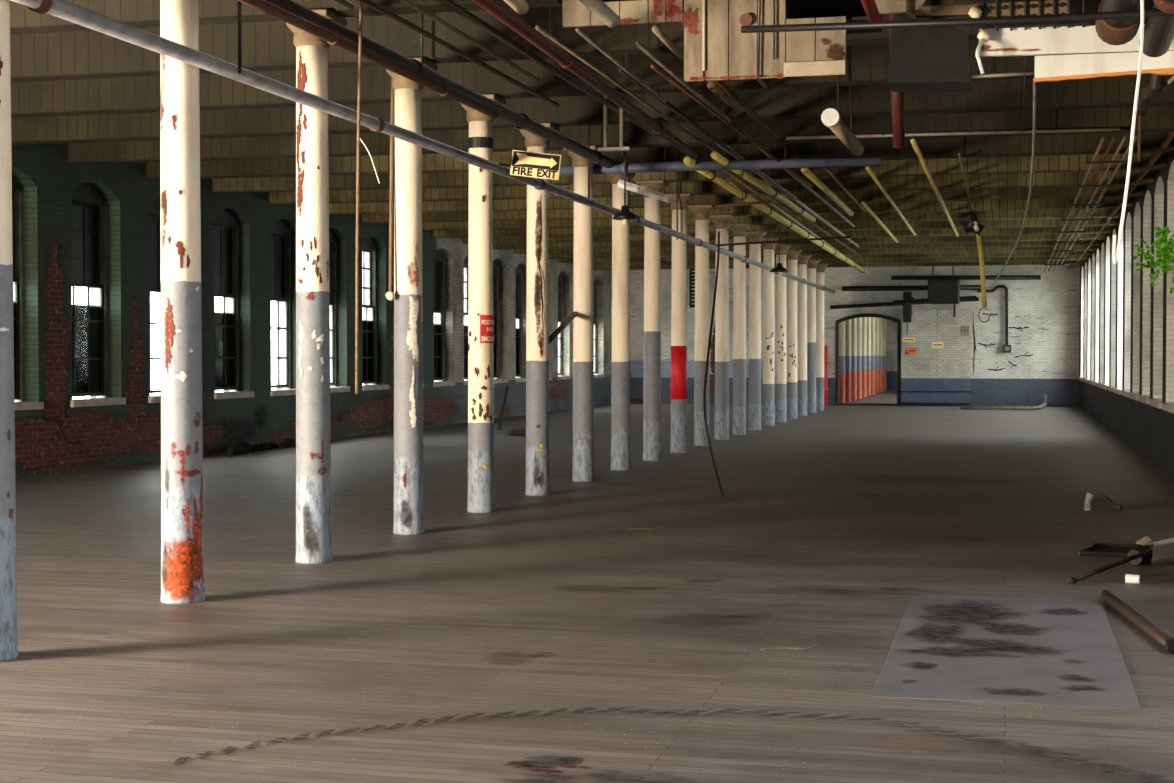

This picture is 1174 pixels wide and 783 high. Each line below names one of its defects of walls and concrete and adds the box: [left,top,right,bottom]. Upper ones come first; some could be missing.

peeling [15,240,161,478]
spalling [165,297,188,382]
peeling [202,411,228,448]
spalling [298,322,324,382]
peeling [330,235,514,436]
rust [161,442,204,599]